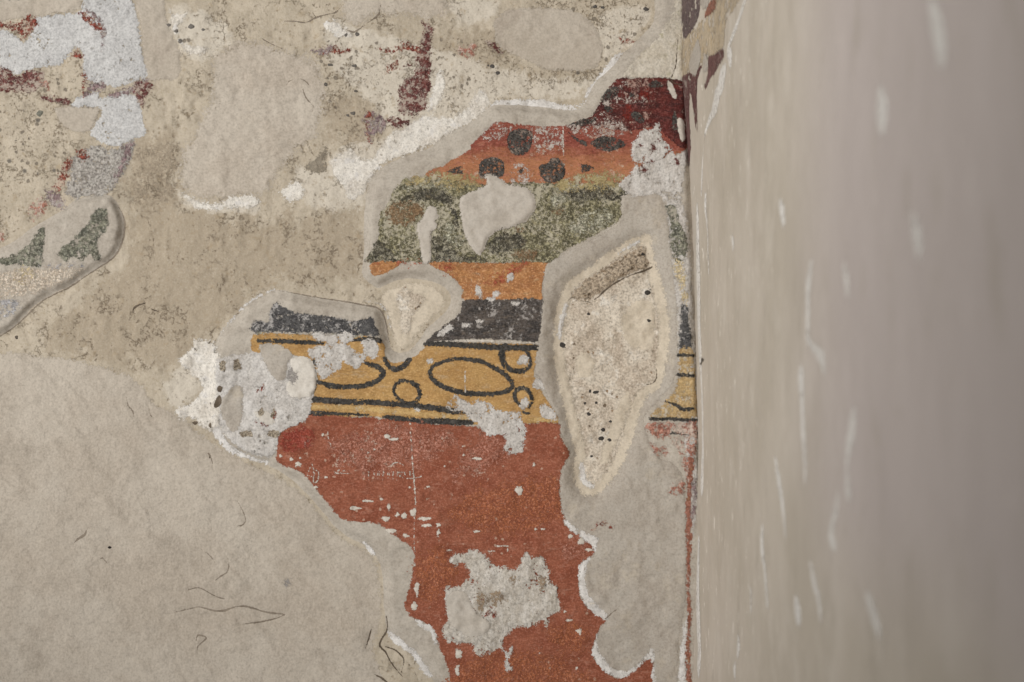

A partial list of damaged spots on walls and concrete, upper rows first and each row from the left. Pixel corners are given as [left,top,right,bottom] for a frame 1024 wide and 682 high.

spalling [174,338,318,468]
spalling [381,281,446,350]
spalling [552,233,672,497]
peeling [350,498,441,537]
spalling [442,545,582,676]